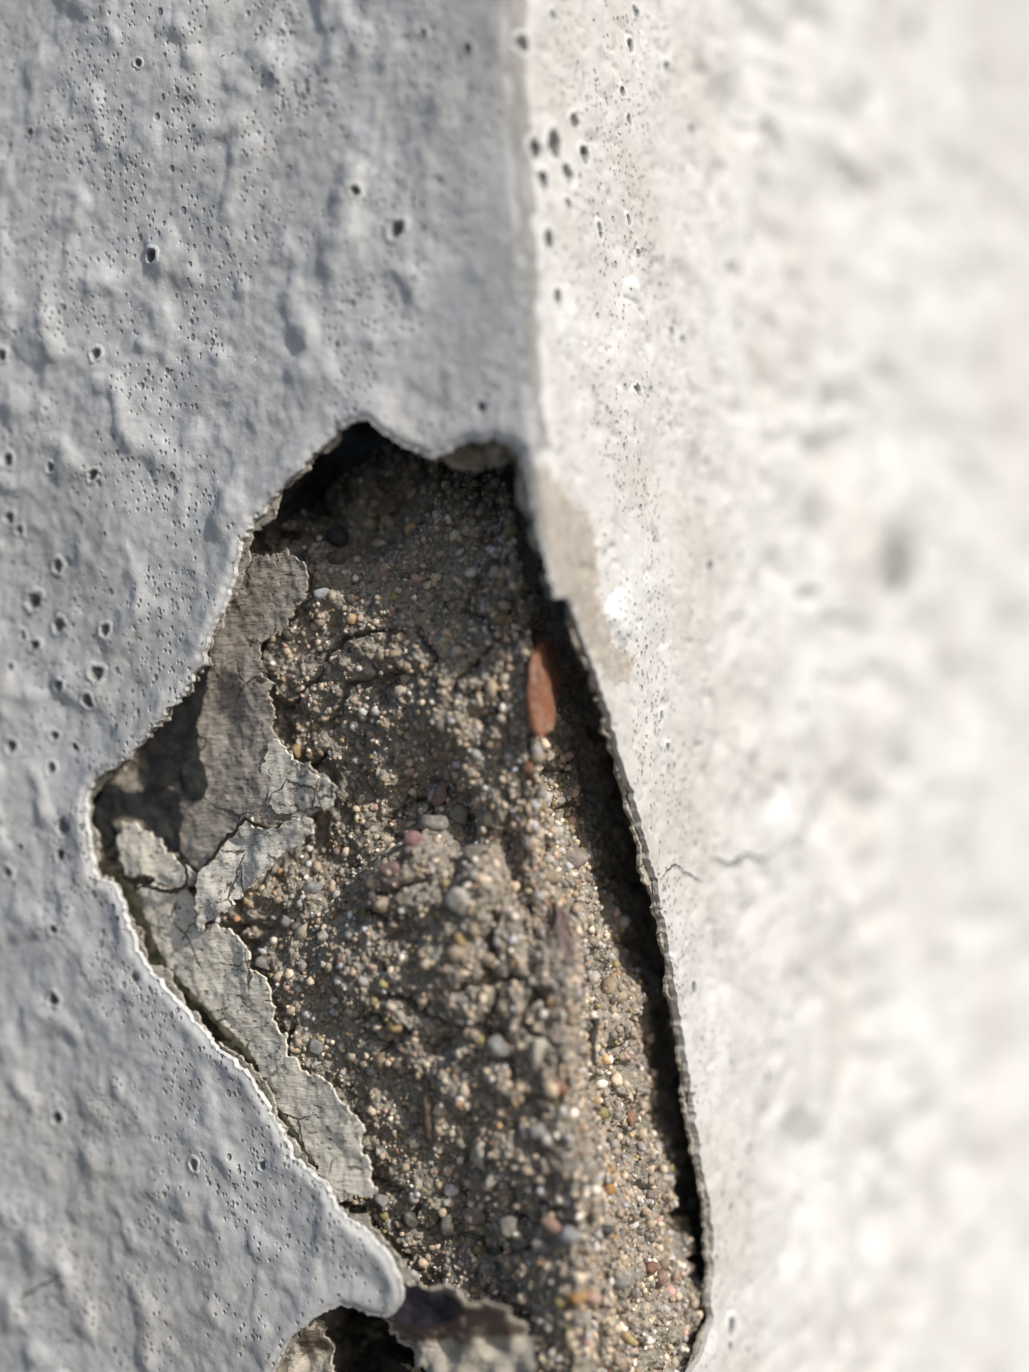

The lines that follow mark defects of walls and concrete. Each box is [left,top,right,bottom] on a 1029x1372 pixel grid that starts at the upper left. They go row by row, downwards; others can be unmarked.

spalling [84,465,102,486]
spalling [51,661,108,713]
crack [135,816,283,894]
spalling [97,420,707,1372]
spalling [725,1310,739,1357]